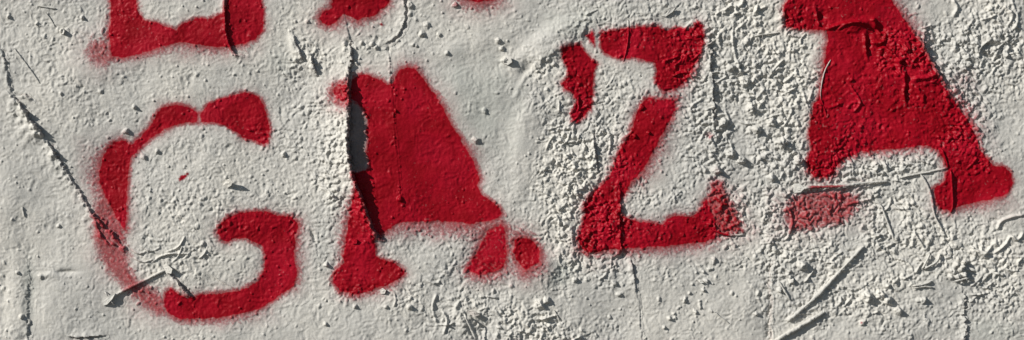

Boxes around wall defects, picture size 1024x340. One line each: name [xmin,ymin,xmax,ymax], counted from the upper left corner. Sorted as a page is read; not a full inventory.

crack [0,47,131,256]
crack [222,0,249,58]
crack [291,0,411,242]